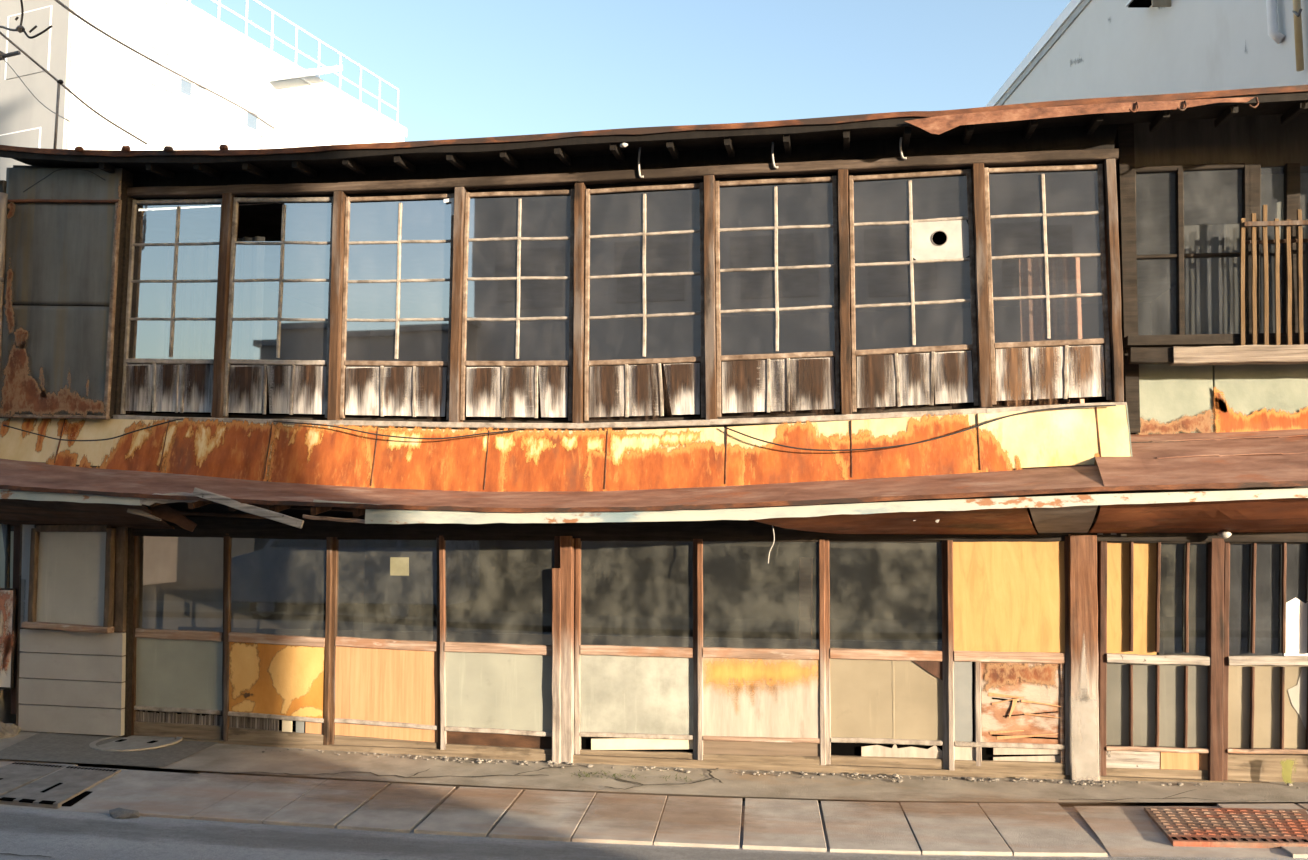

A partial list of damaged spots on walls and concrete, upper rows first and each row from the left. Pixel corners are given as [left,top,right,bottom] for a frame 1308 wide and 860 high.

leakage [344,366,448,418]
rust [0,258,1023,492]
leakage [470,366,568,421]
leakage [589,364,698,421]
leakage [723,358,834,417]
leakage [855,352,975,413]
rust [0,590,15,671]
peeling [229,642,325,717]